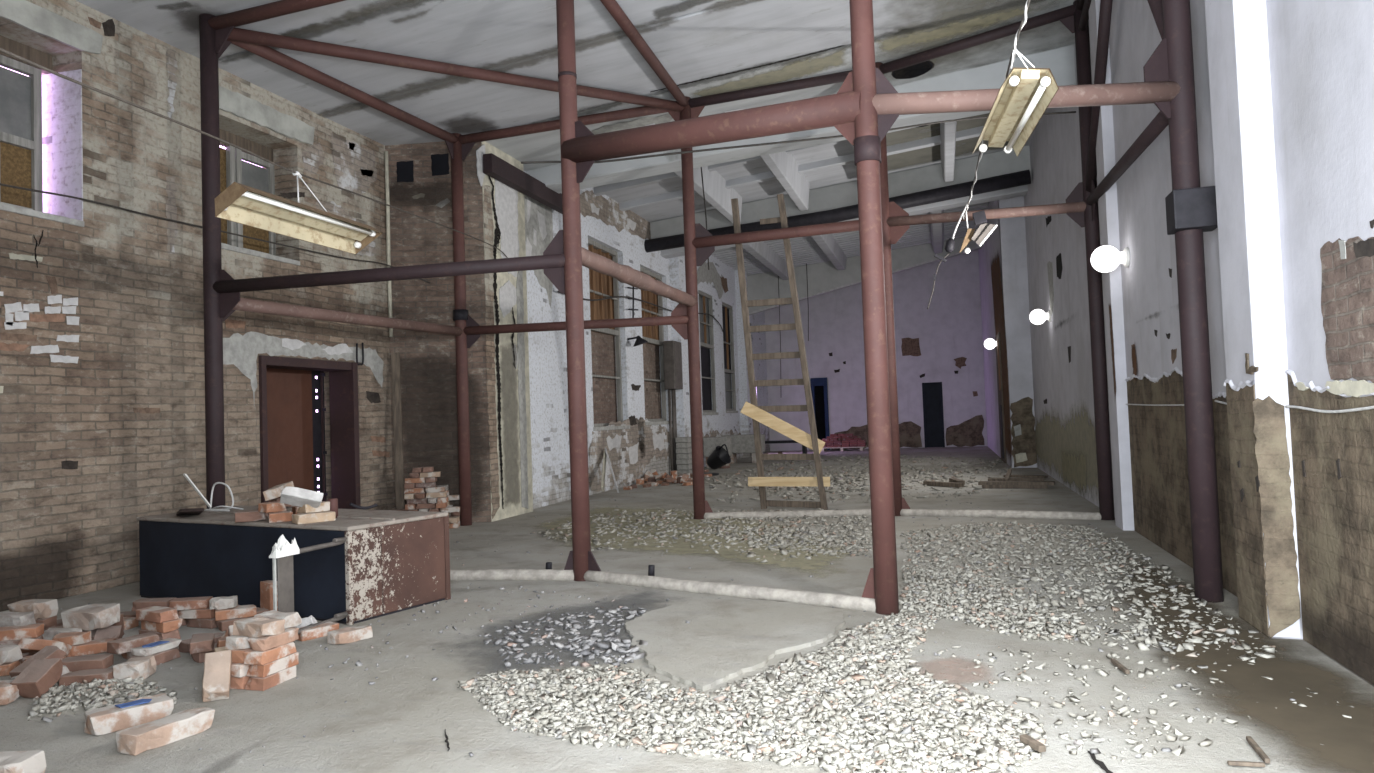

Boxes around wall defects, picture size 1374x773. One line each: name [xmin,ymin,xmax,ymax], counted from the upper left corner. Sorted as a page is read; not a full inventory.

damp [226,0,429,62]
damp [575,0,760,51]
damp [874,0,1039,50]
damp [321,48,558,116]
damp [647,45,851,96]
flaking render [580,190,651,239]
peeling [0,253,80,363]
flaking render [223,319,384,407]
flaking render [476,144,553,519]
flaking render [588,415,673,492]
flaking render [1125,330,1193,568]
flaking render [1212,219,1374,661]